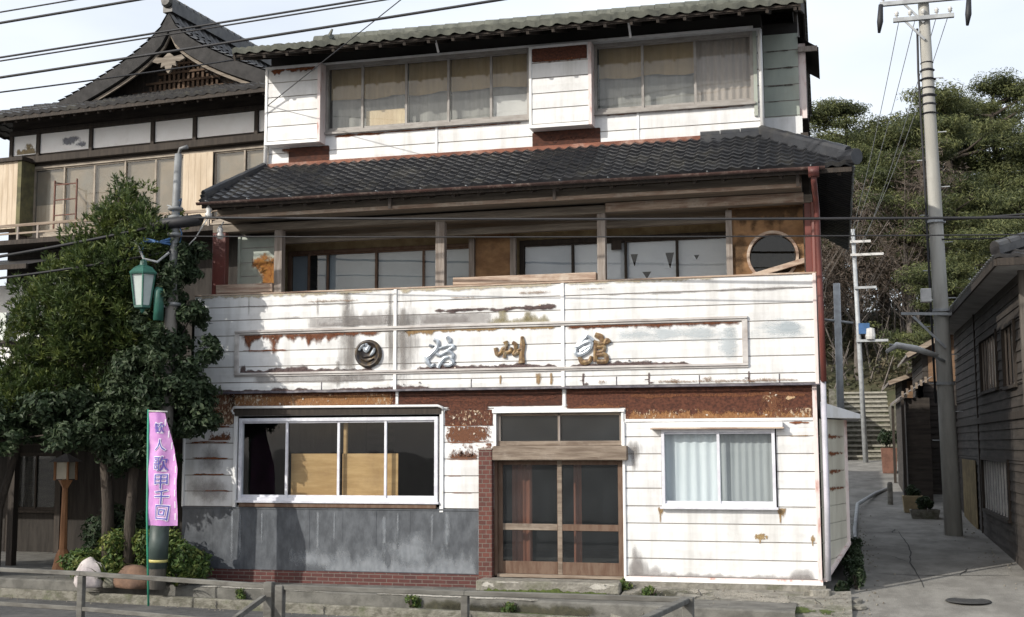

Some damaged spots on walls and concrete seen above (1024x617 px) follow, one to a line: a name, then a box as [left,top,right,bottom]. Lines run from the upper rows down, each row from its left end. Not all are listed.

rust [244,332,377,352]
rust [191,426,230,444]
rust [230,377,813,460]
crack [850,529,930,587]